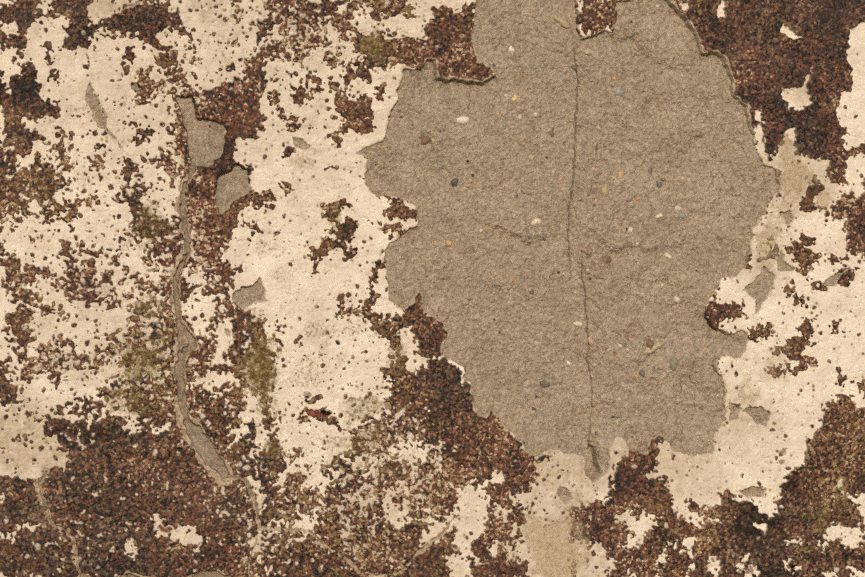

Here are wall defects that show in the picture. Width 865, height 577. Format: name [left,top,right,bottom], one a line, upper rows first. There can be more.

crack [33,467,91,577]
crack [117,569,149,577]
peeling [0,0,293,481]
crack [168,160,460,577]
flaking render [215,0,865,577]